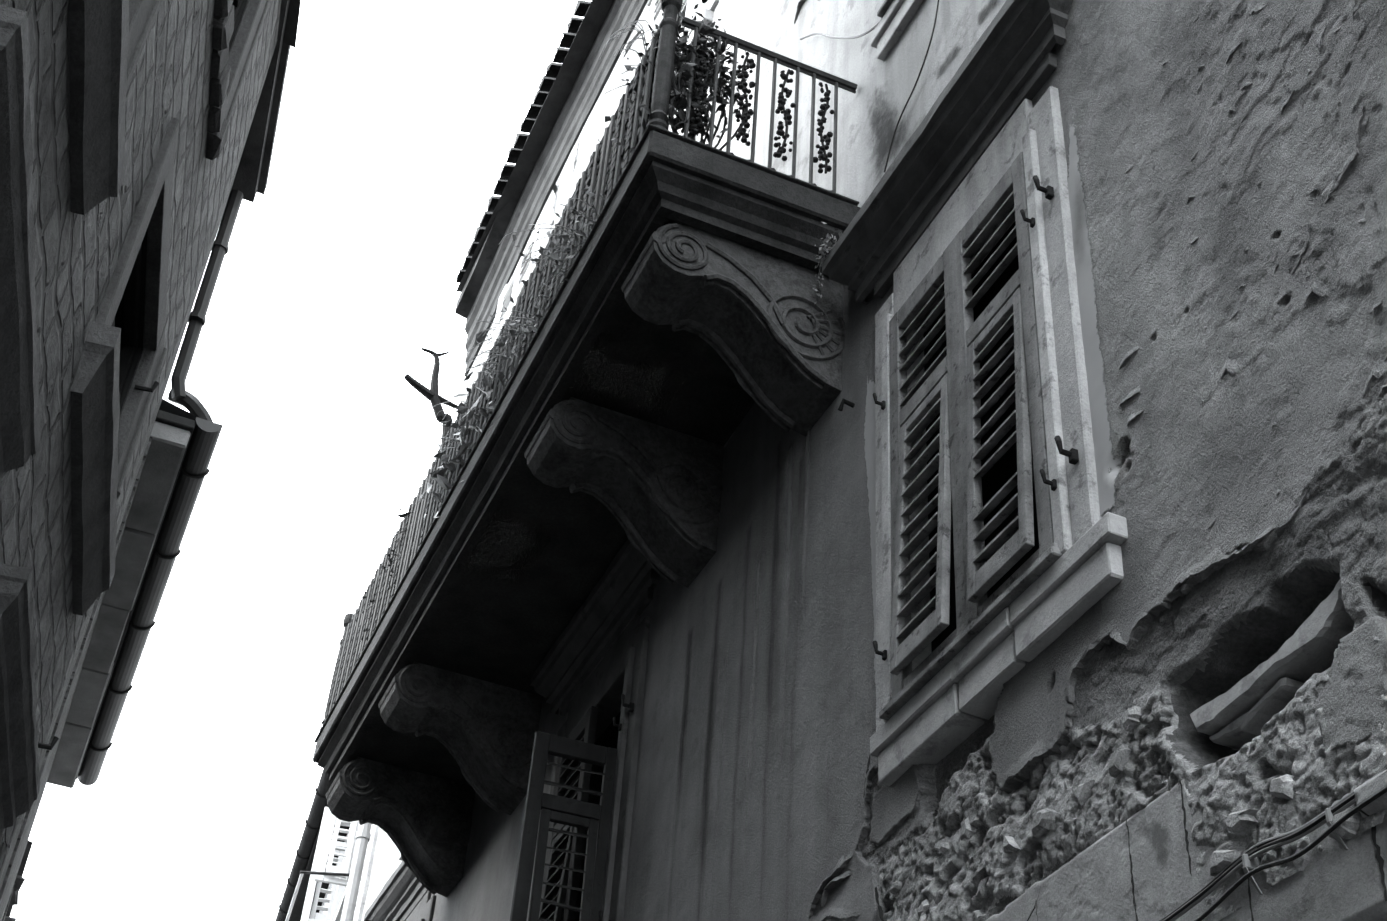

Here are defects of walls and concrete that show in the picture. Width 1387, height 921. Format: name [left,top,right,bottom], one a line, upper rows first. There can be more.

peeling [1067,122,1143,516]
peeling [1304,272,1329,303]
spalling [861,355,1387,921]